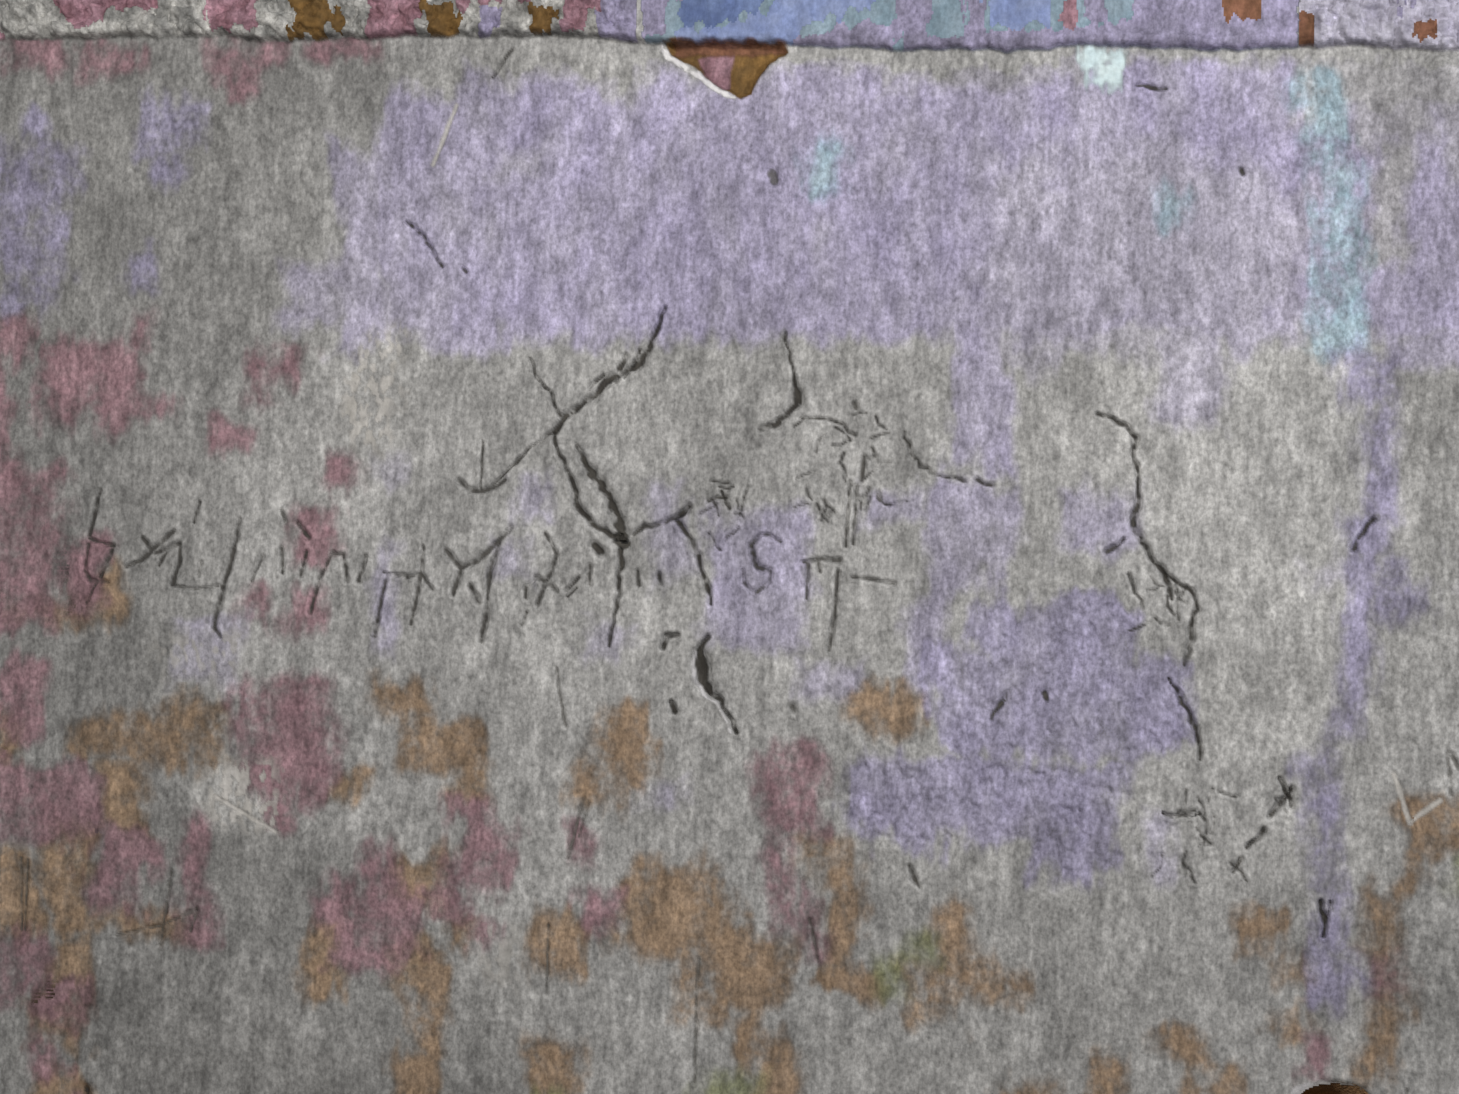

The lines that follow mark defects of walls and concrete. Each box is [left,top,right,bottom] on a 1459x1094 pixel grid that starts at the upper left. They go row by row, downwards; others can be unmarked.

spalling [661,38,788,99]
crack [760,337,993,522]
crack [496,314,745,734]
crack [1097,413,1293,881]
hole [1290,1080,1368,1094]